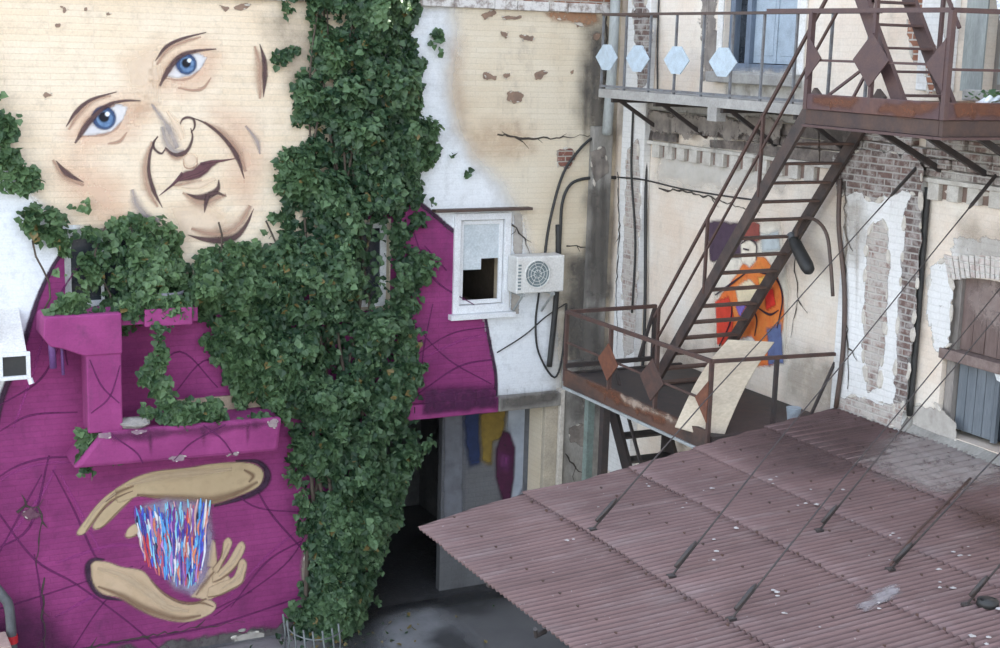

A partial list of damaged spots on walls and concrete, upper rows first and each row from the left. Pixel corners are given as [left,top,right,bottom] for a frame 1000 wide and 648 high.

spalling [481,9,534,42]
spalling [516,0,610,41]
spalling [632,0,654,88]
peeling [699,0,717,81]
spalling [906,19,934,94]
spalling [483,71,510,80]
spalling [507,91,524,104]
rust [814,97,857,107]
rust [879,103,937,116]
rust [954,102,1000,118]
crack [497,132,590,146]
spalling [836,149,1000,441]